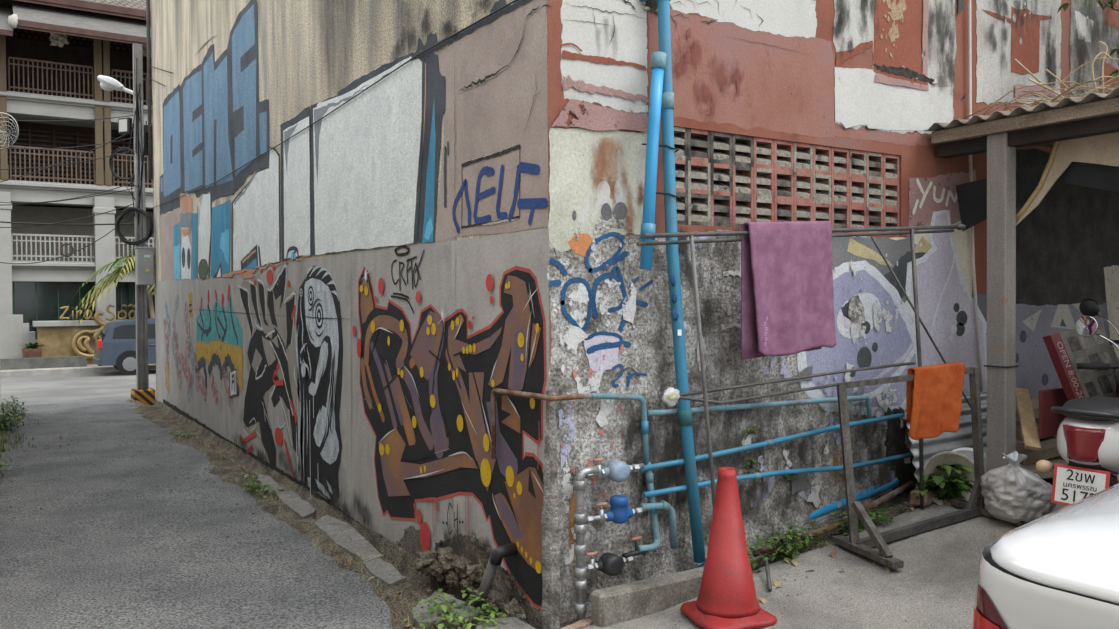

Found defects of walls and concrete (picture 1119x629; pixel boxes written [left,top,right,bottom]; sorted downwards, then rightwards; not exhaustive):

crack [454,0,811,206]
spalling [641,0,658,13]
peeling [873,0,938,85]
peeling [1046,42,1061,80]
peeling [1075,0,1109,43]
corrosion [597,141,642,231]